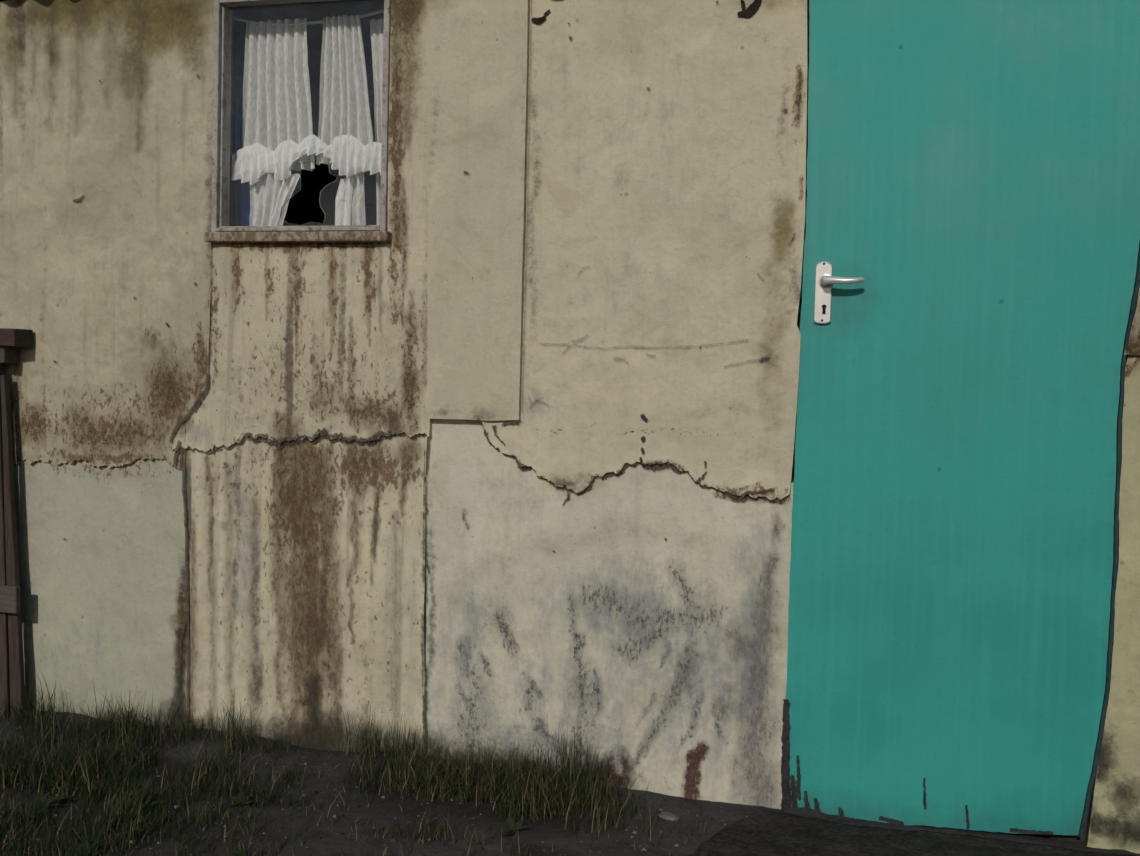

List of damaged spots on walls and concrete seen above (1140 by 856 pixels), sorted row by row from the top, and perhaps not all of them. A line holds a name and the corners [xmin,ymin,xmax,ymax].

rust [389,1,414,294]
crack [468,0,787,505]
rust [270,412,353,738]
rust [311,305,419,565]
water stain [229,566,727,787]
water stain [1091,815,1140,846]